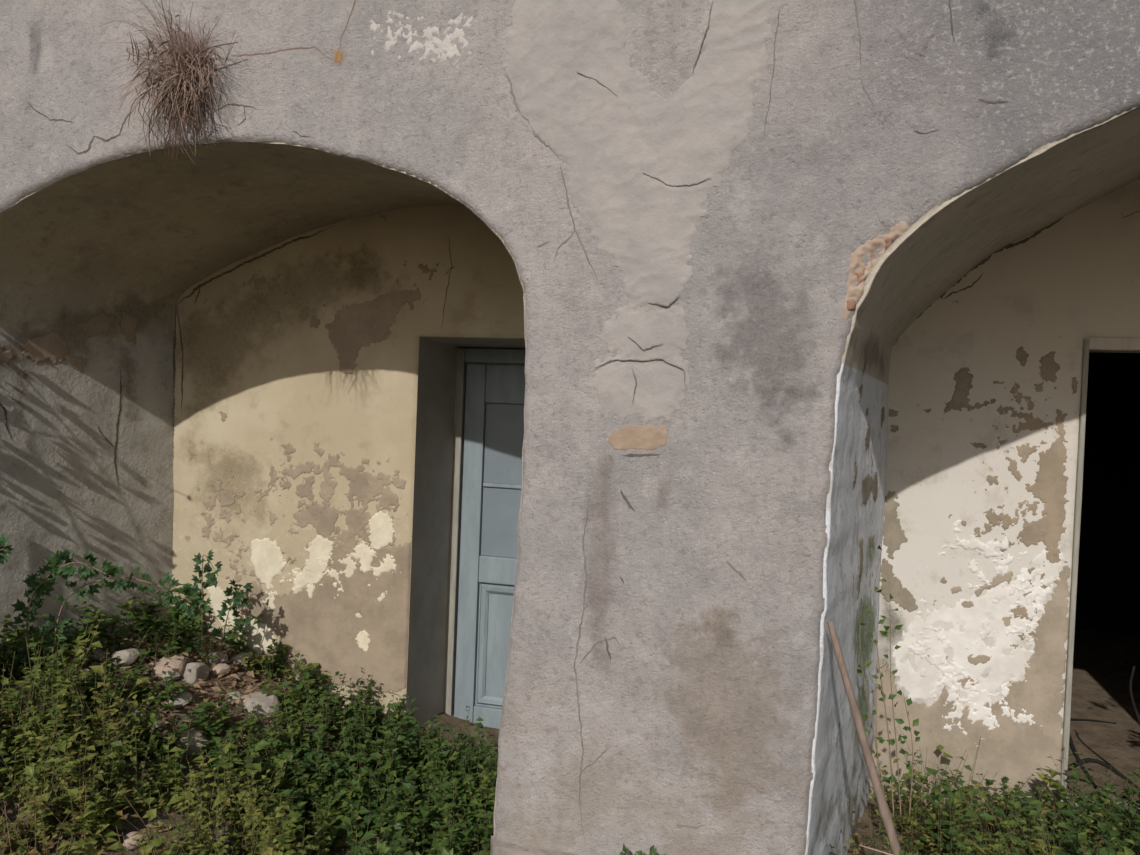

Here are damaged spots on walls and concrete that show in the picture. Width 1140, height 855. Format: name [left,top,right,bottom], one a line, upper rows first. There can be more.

crack [237,0,355,61]
peeling [370,2,483,71]
crack [173,227,330,457]
peeling [301,253,455,374]
crack [537,164,597,278]
spalling [842,221,909,319]
crack [894,218,1062,345]
crack [97,367,122,490]
flaking render [608,424,668,457]
peeling [197,442,411,693]
peeling [852,346,1078,813]
crack [574,497,621,840]